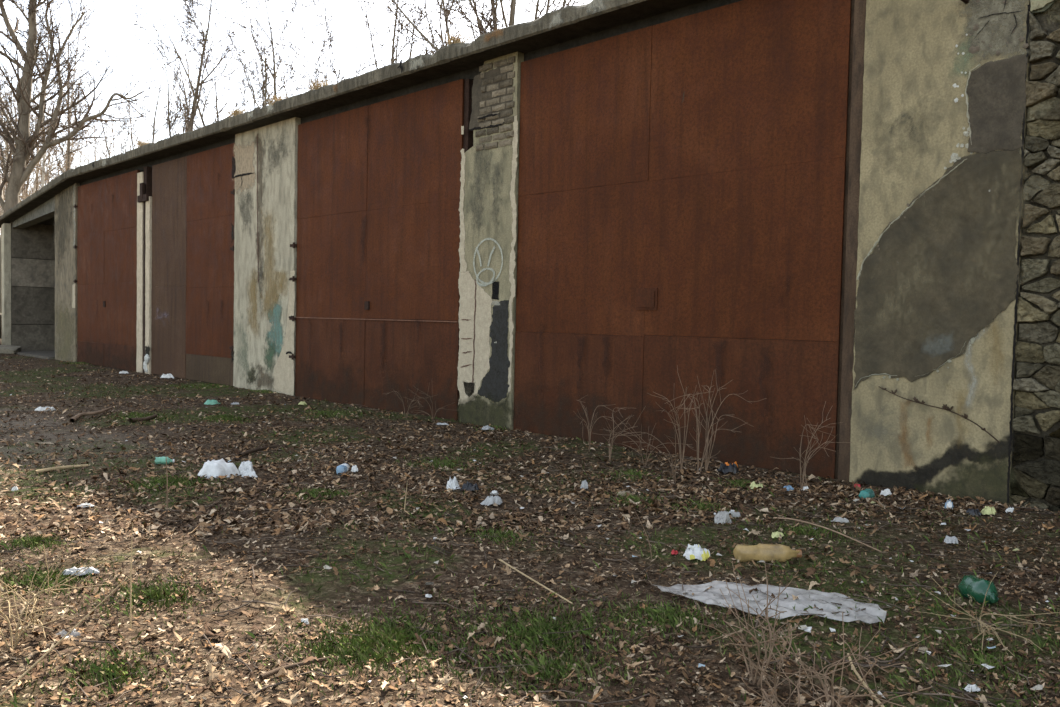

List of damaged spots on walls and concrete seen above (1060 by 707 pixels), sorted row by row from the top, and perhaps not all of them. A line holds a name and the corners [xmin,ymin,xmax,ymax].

leakage [240,134,285,297]
peeling [457,56,518,405]
spalling [854,0,1054,389]